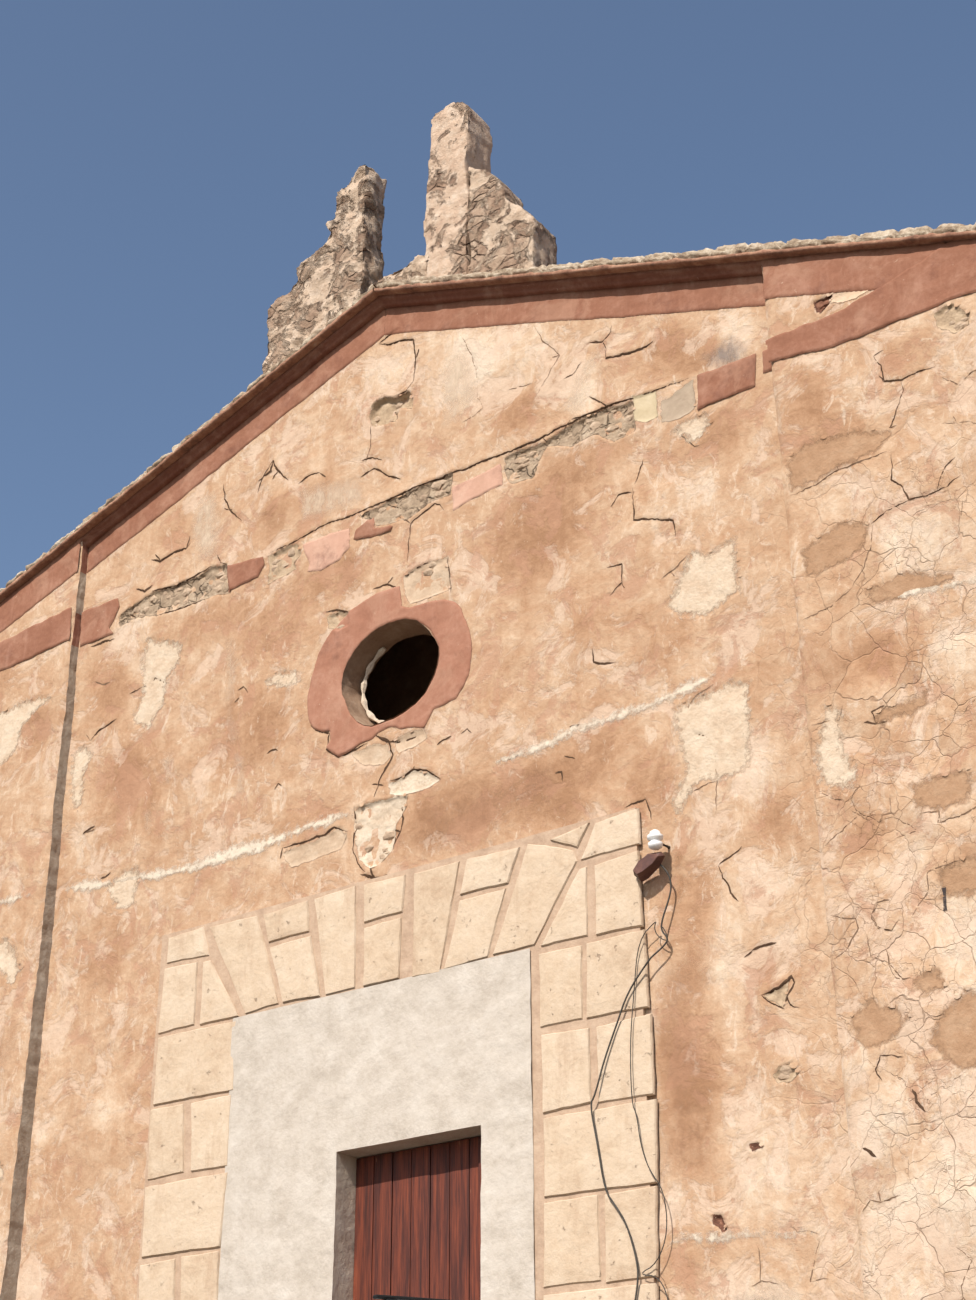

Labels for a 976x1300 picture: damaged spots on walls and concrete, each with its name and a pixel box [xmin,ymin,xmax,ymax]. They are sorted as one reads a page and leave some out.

crack [258,460,326,490]
spalling [360,472,453,526]
crack [270,325,684,589]
crack [792,351,976,620]
spalling [119,564,231,626]
spalling [268,544,301,584]
spalling [403,556,452,604]
spalling [352,728,427,766]
spalling [283,770,439,868]
crack [718,846,742,901]
crack [745,942,777,957]
crack [762,975,795,1009]